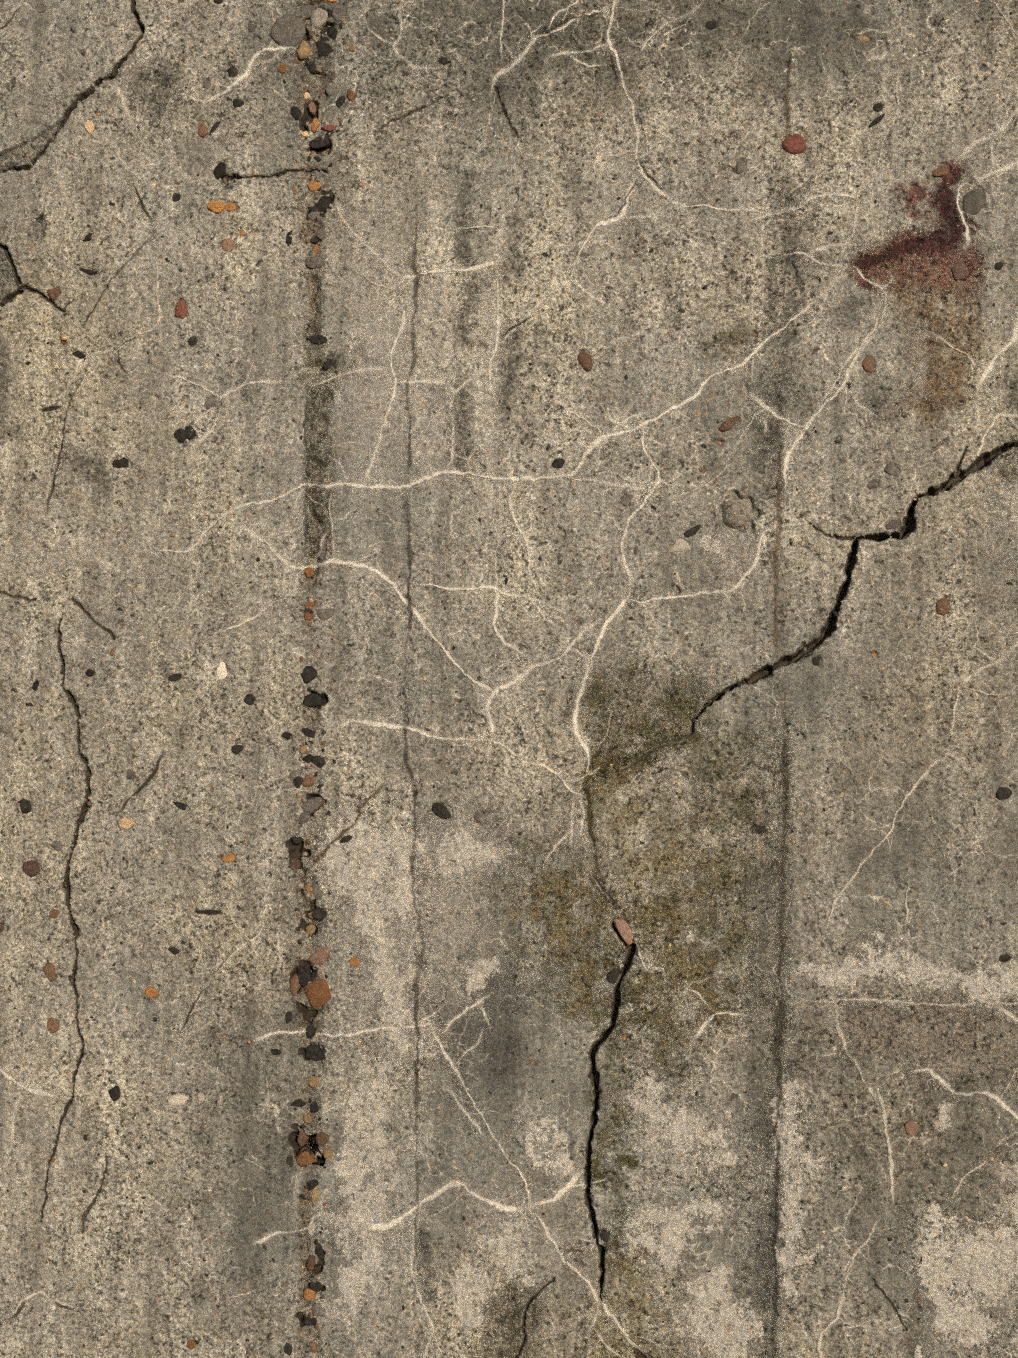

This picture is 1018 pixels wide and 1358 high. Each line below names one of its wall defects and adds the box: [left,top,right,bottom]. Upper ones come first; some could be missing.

crack [0,0,293,173]
rust [848,160,979,420]
crack [161,0,1018,922]
crack [0,591,33,602]
crack [10,1160,109,1318]
crack [0,597,163,1223]
crack [256,921,645,1358]
spalling [633,1346,654,1358]
crack [691,990,746,1037]
crack [815,998,1018,1358]